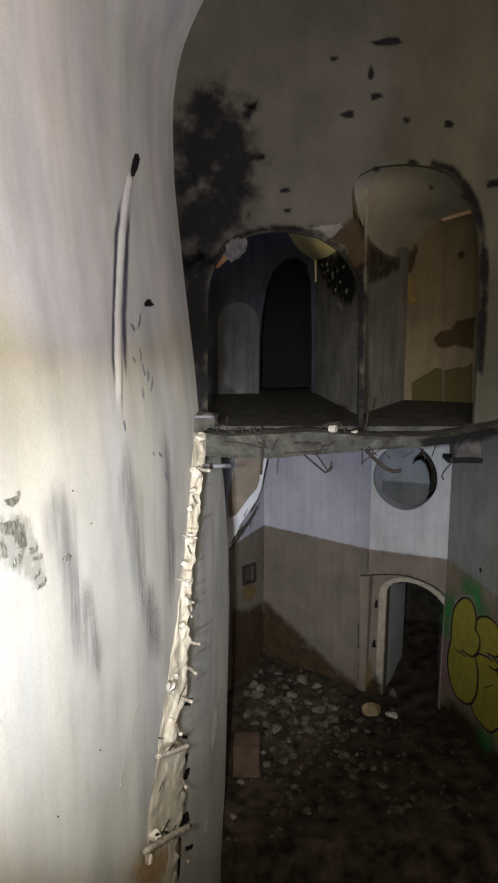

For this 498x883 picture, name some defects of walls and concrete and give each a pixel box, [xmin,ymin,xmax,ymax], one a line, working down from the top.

peeling [0,491,46,590]
spalling [142,430,211,883]